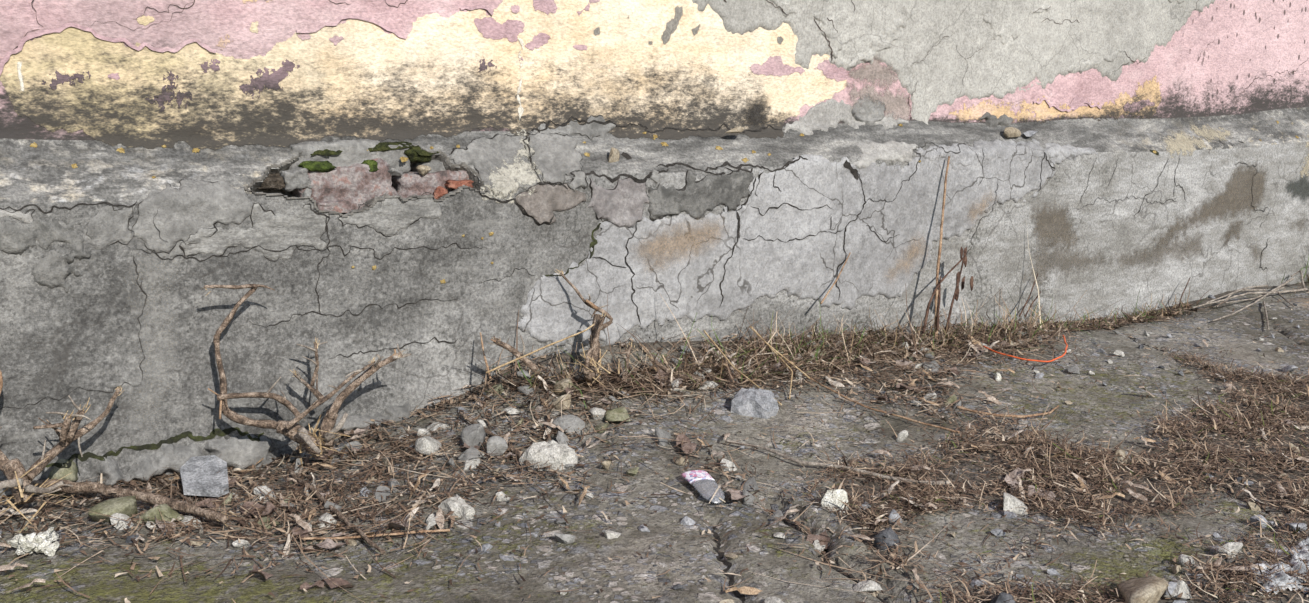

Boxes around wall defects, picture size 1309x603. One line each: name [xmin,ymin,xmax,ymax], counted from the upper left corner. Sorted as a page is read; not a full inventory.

peeling [0,0,848,228]
water stain [746,102,767,125]
crack [908,34,979,116]
peeling [949,75,1162,124]
crack [479,116,998,306]
water stain [1120,166,1265,262]
water stain [1287,176,1309,201]
crack [0,179,486,409]
crack [481,221,641,324]